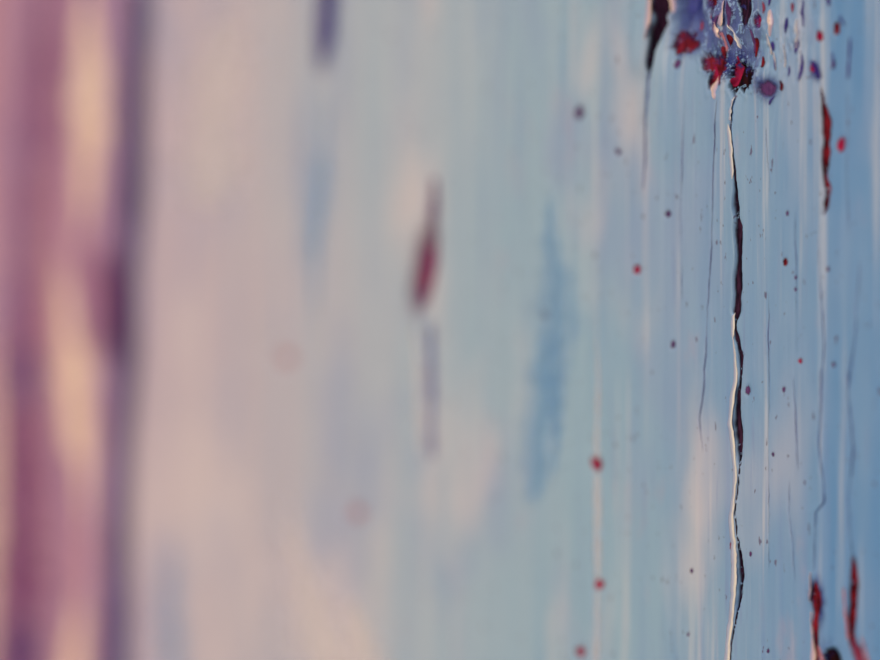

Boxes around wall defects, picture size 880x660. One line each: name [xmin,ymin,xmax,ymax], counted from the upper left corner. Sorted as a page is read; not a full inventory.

crack [643,0,676,187]
peeling [713,0,742,49]
crack [738,0,752,26]
spalling [766,0,821,80]
crack [818,87,832,247]
crack [699,232,712,449]
crack [712,102,745,660]
crack [789,286,825,573]
spalling [808,572,841,660]
spalling [843,558,869,660]